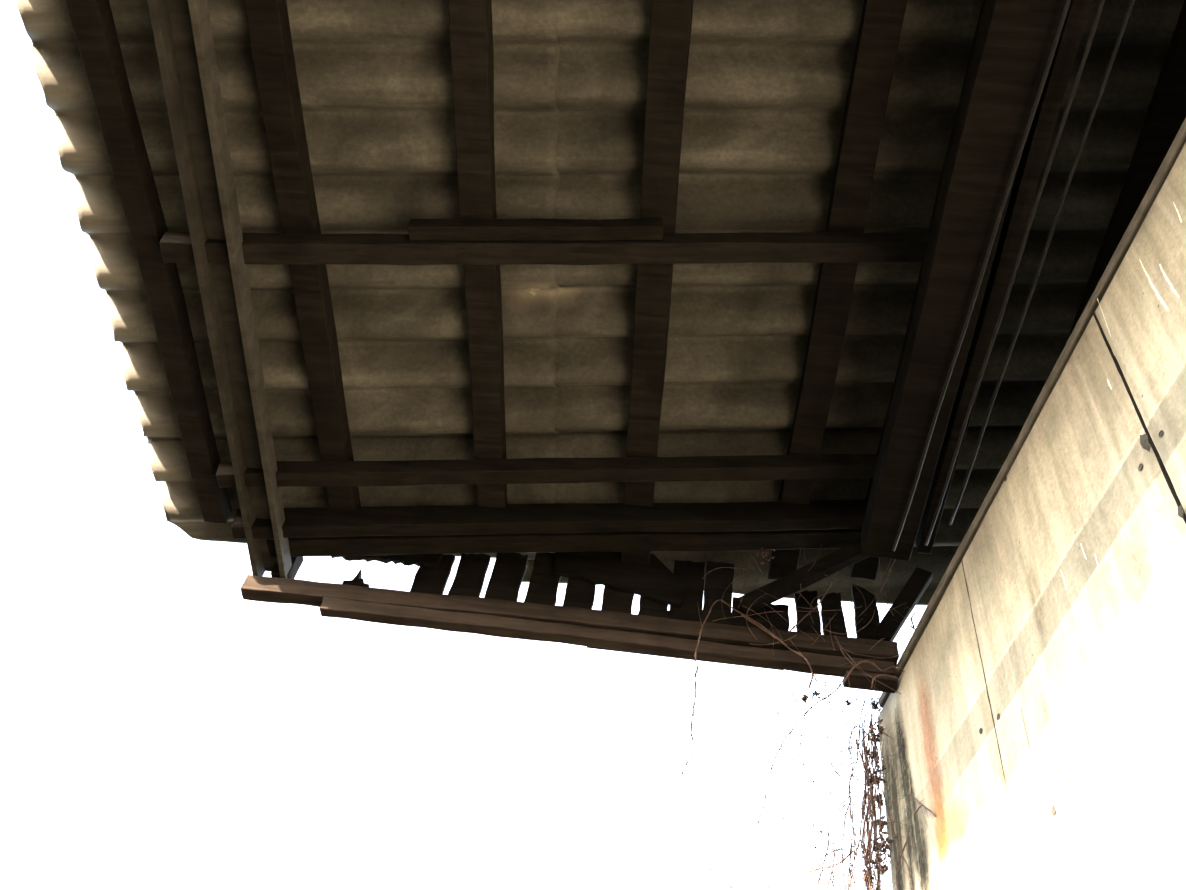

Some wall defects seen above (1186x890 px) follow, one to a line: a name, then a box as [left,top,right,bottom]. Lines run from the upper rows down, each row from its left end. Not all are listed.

leakage [885,716,929,890]